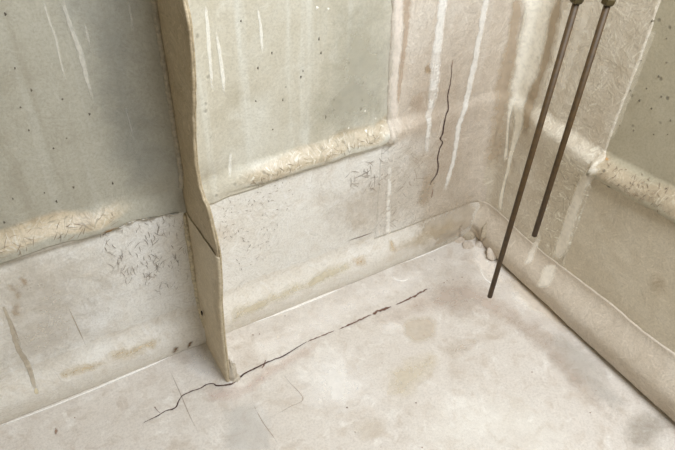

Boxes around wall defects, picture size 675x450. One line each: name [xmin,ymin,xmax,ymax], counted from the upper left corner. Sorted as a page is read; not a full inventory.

damp [63,6,90,88]
damp [426,0,446,147]
crack [430,62,453,198]
damp [447,0,488,182]
crack [145,289,427,422]